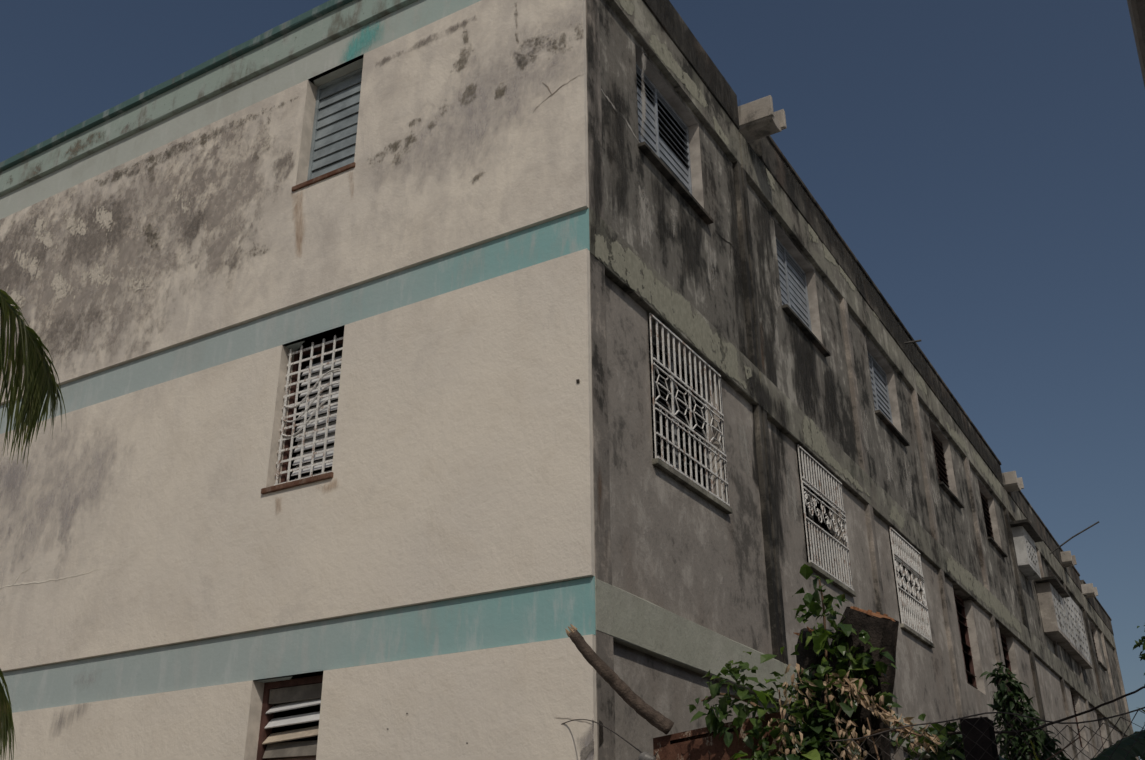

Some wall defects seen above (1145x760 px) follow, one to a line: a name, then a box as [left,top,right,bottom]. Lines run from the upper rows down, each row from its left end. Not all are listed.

damp [515,0,597,69]
damp [0,113,269,373]
damp [276,152,293,178]
damp [589,85,716,289]
damp [748,143,1005,481]